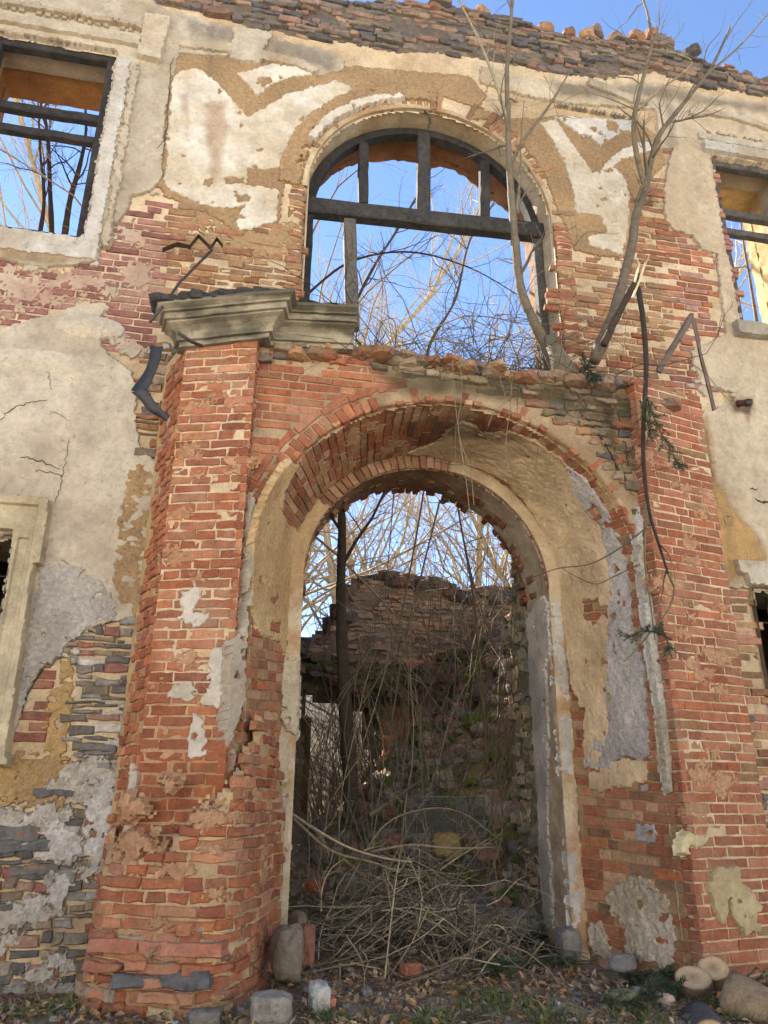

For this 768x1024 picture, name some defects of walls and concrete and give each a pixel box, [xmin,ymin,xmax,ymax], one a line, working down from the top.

flaking render [236,63,312,96]
spalling [466,103,737,398]
spalling [731,267,745,319]
crack [0,372,70,502]
flaking render [0,68,456,1019]
flaking render [343,410,700,971]
flaking render [672,828,709,857]
flaking render [706,865,763,938]